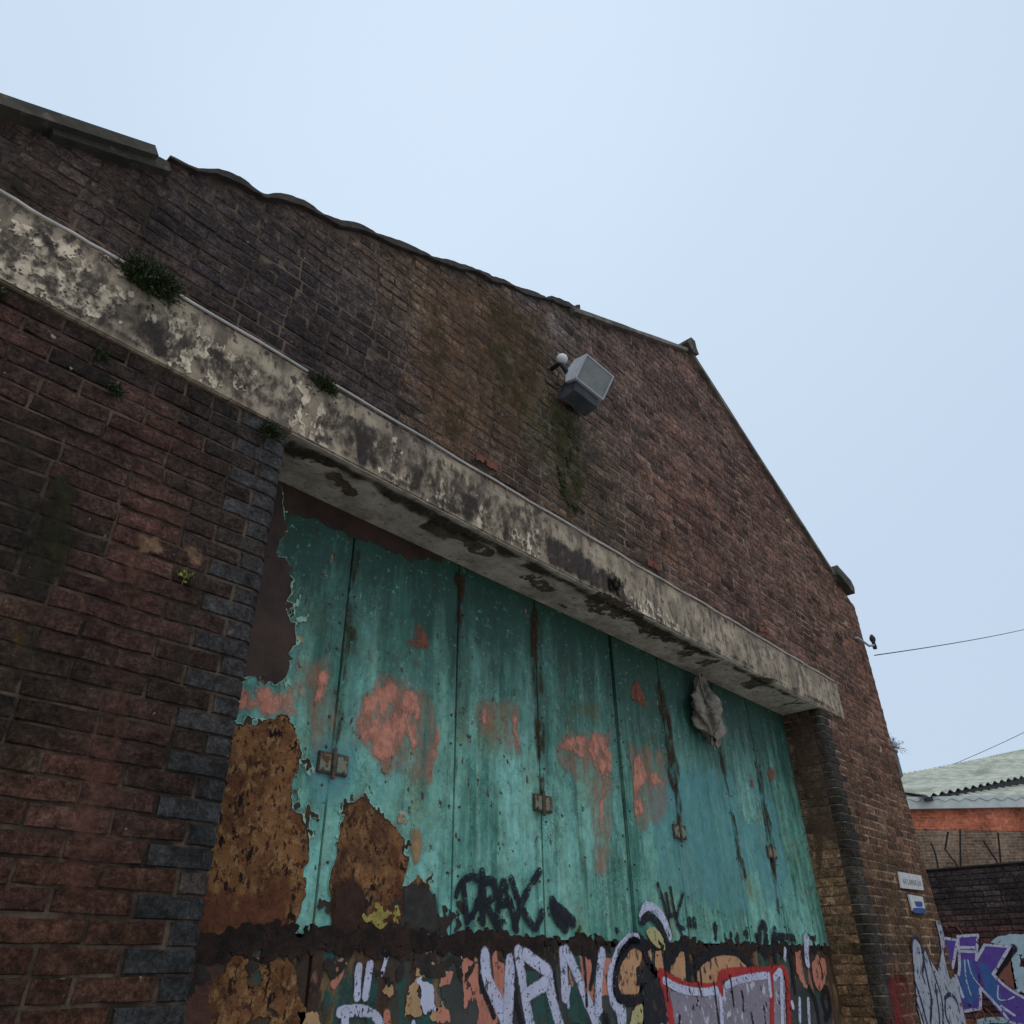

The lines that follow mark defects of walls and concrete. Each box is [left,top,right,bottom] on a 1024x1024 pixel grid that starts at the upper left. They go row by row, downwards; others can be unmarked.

water stain [0,227,299,412]
water stain [284,406,720,658]
rust [198,713,320,937]
peeling [238,481,444,731]
rust [328,790,436,934]
peeling [357,679,440,782]
peeling [559,733,612,872]
rust [657,680,682,823]
water stain [733,637,840,714]
rust [184,949,307,1024]
rust [370,948,475,987]
rust [517,946,559,974]